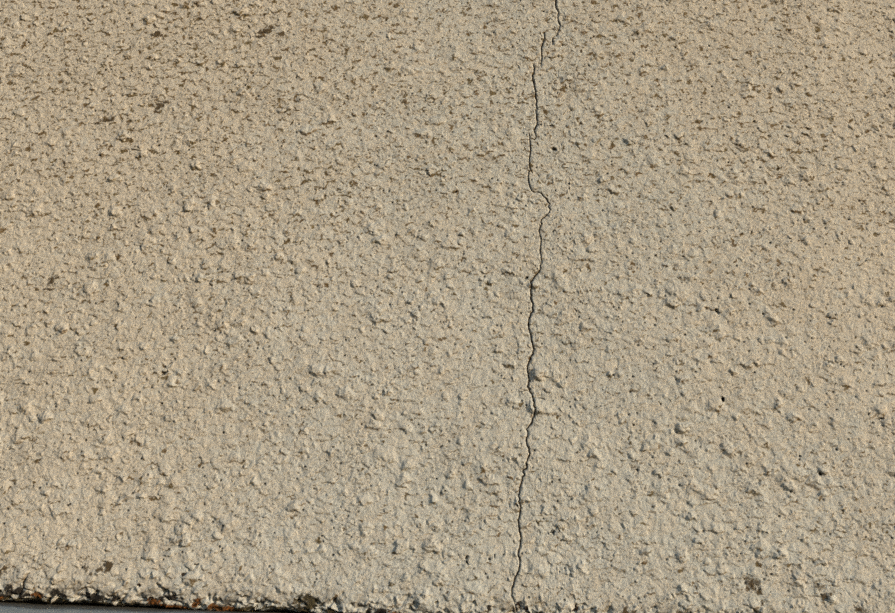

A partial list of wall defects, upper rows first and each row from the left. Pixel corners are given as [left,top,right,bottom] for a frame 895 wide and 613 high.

crack [511,0,561,608]